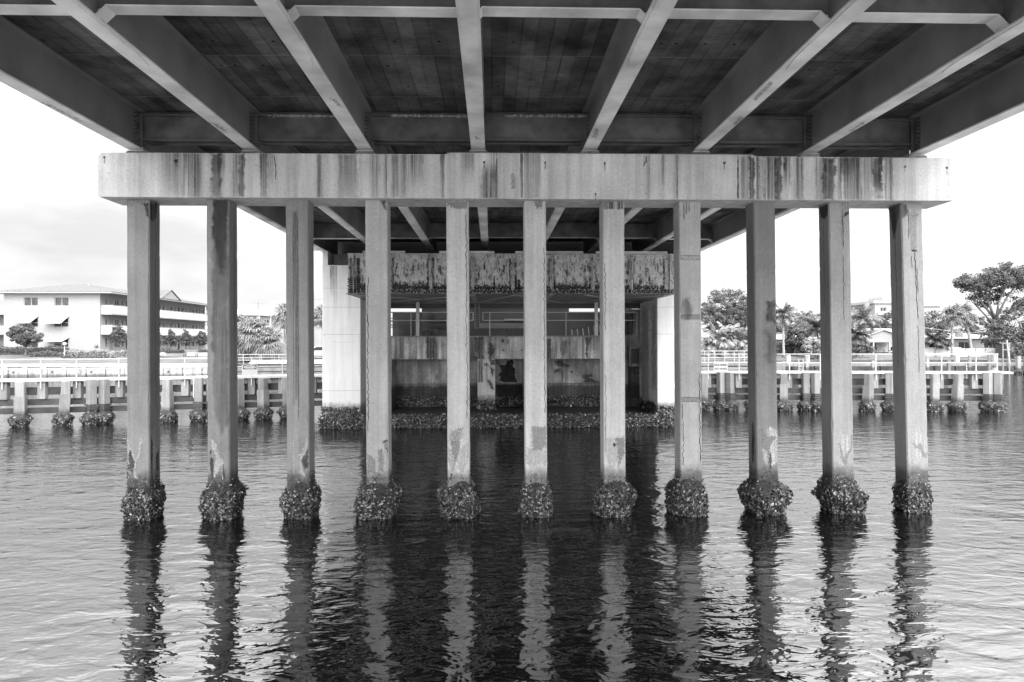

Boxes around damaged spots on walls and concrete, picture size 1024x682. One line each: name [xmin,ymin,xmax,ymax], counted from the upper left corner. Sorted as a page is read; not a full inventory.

water stain [184,153,245,193]
water stain [749,156,802,200]
water stain [821,156,891,199]
peeling [485,339,523,406]
peeling [127,433,159,479]
peeling [209,438,225,479]
peeling [293,436,309,477]
peeling [367,440,388,473]
peeling [762,427,778,466]